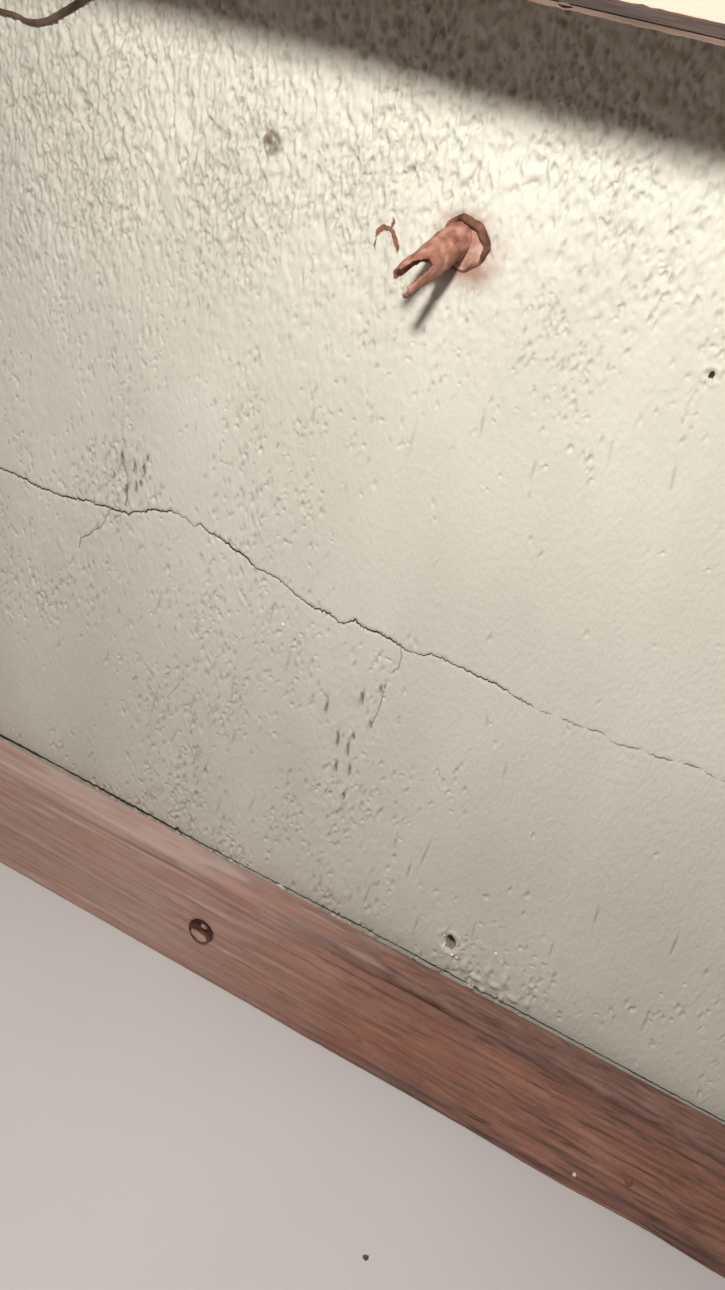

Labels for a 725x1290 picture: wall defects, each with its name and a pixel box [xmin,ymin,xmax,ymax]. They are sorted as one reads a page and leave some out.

rust [373,218,399,252]
crack [0,456,725,782]